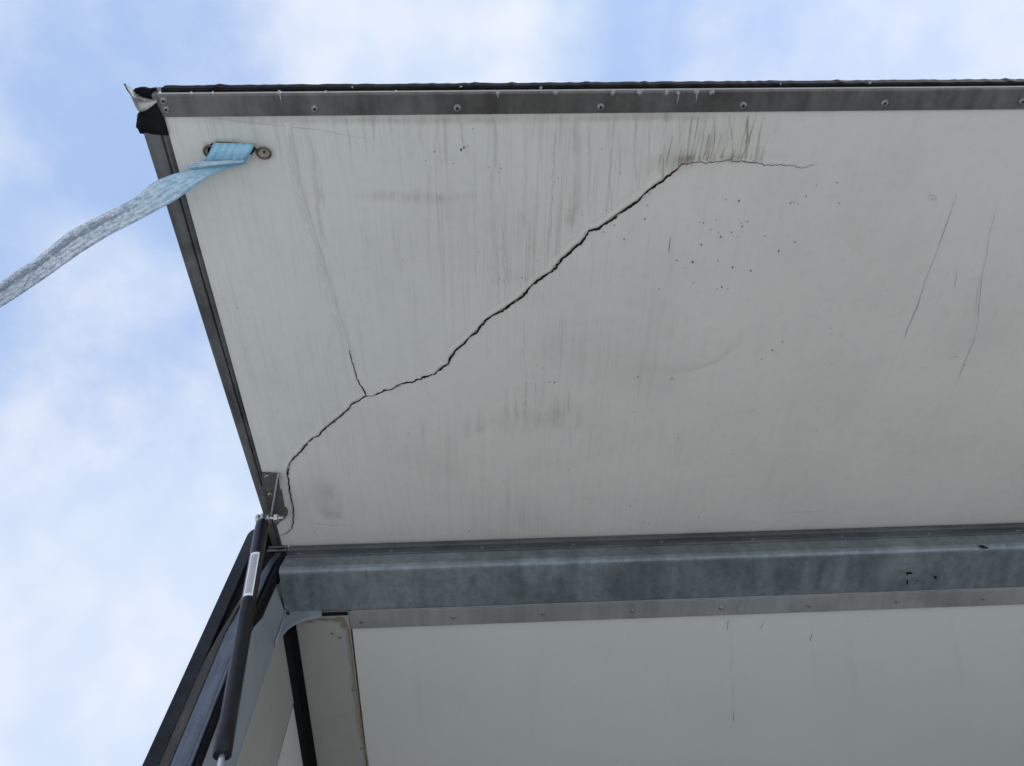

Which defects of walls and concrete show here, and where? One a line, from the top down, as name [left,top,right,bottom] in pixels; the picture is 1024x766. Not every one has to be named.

crack [279,158,817,536]